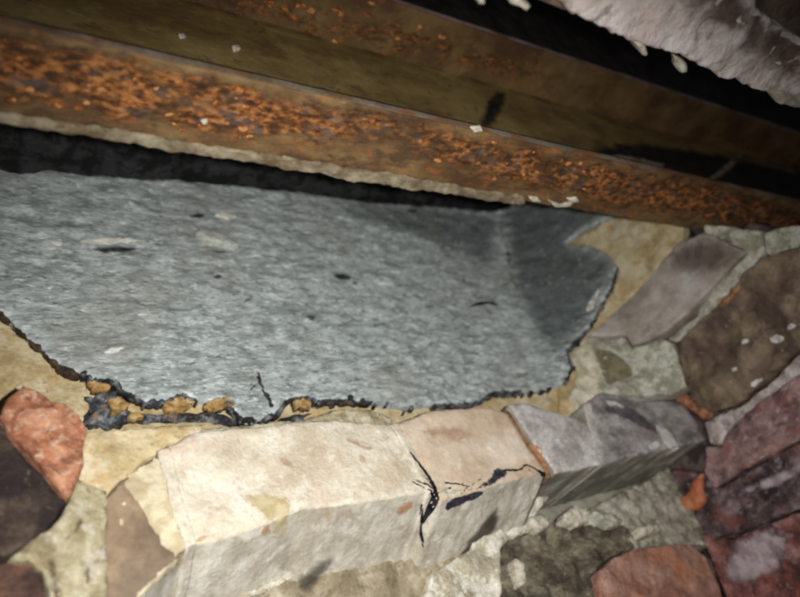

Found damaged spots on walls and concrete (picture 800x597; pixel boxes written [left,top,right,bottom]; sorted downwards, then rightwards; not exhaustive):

corrosion [232,1,521,73]
corrosion [0,36,396,144]
corrosion [415,124,800,228]
crack [249,369,274,408]
crack [410,452,451,548]
crack [503,464,547,478]